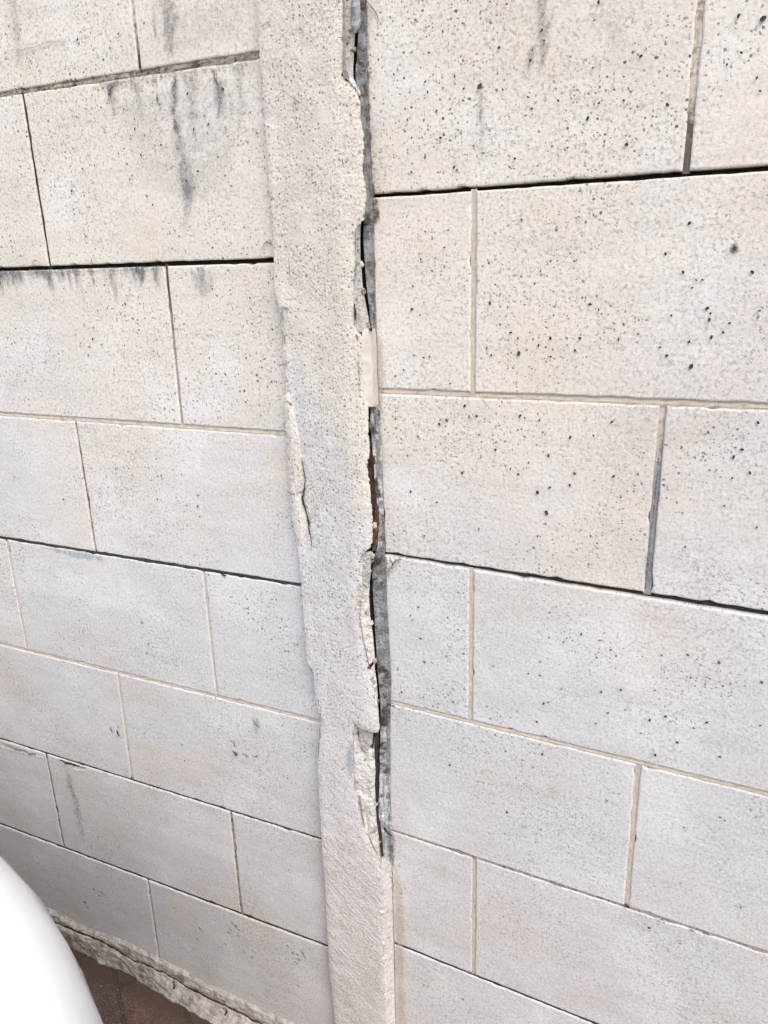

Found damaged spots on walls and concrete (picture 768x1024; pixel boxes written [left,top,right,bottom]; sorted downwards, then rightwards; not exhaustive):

water stain [153,76,195,217]
crack [297,461,312,547]
rust [367,442,379,551]
crack [374,554,401,577]
spalling [354,551,382,863]